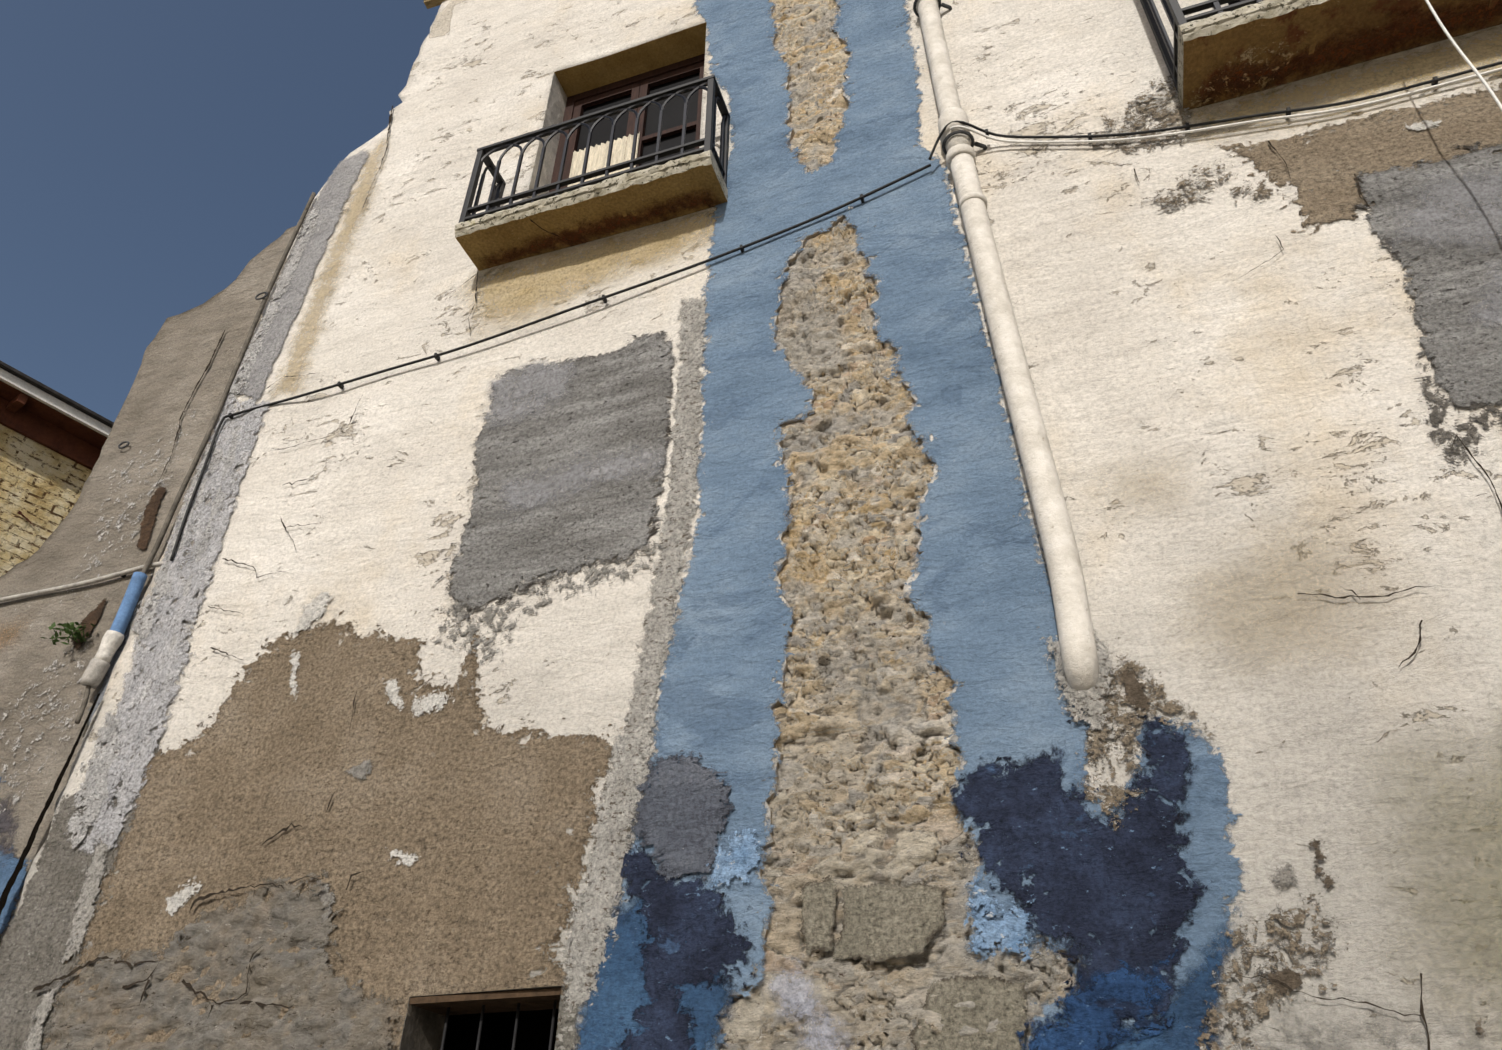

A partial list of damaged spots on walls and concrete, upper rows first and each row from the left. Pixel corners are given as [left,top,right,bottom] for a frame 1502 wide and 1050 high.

spalling [769,0,850,172]
corrosion [1202,0,1502,102]
crack [1450,435,1502,510]
spalling [706,219,1080,1050]
peeling [21,591,623,1050]
crack [33,946,293,1017]
peeling [1186,839,1351,1050]
crack [1220,966,1430,1050]